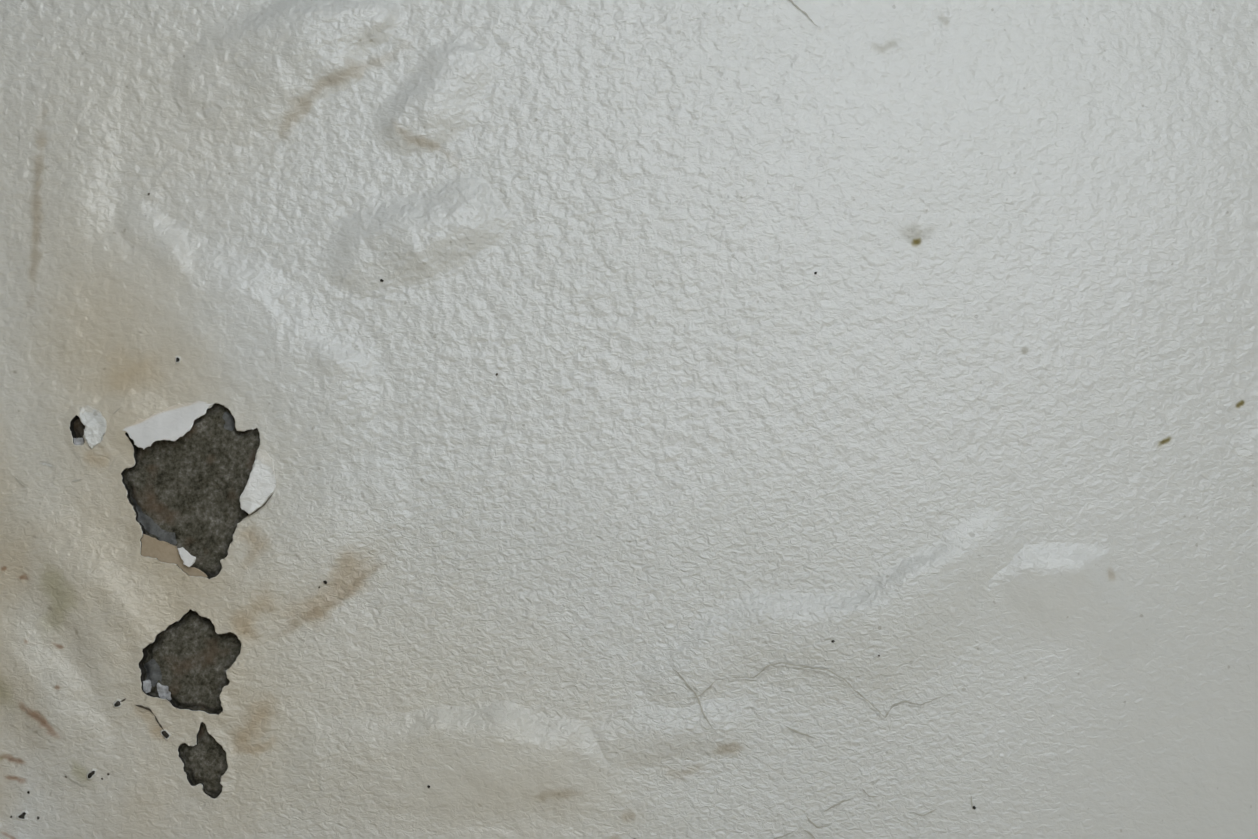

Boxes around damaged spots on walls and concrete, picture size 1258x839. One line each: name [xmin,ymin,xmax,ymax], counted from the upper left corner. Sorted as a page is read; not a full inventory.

peeling [61,384,279,811]